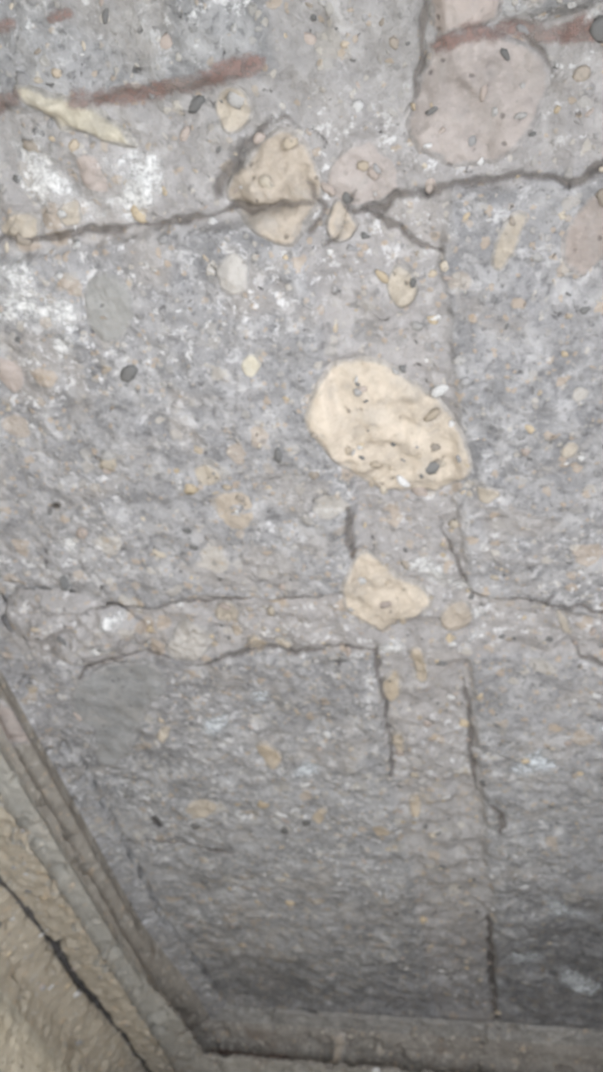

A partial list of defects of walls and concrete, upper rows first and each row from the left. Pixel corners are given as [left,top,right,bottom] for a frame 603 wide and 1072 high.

corrosion [69,55,265,109]
crack [414,0,428,94]
corrosion [431,15,594,51]
crack [0,118,603,250]
crack [346,508,356,557]
crack [448,539,483,597]
crack [514,598,603,614]
crack [578,650,603,666]
crack [198,644,394,777]
crack [463,678,476,779]
crack [0,877,150,1072]
crack [487,918,499,1019]